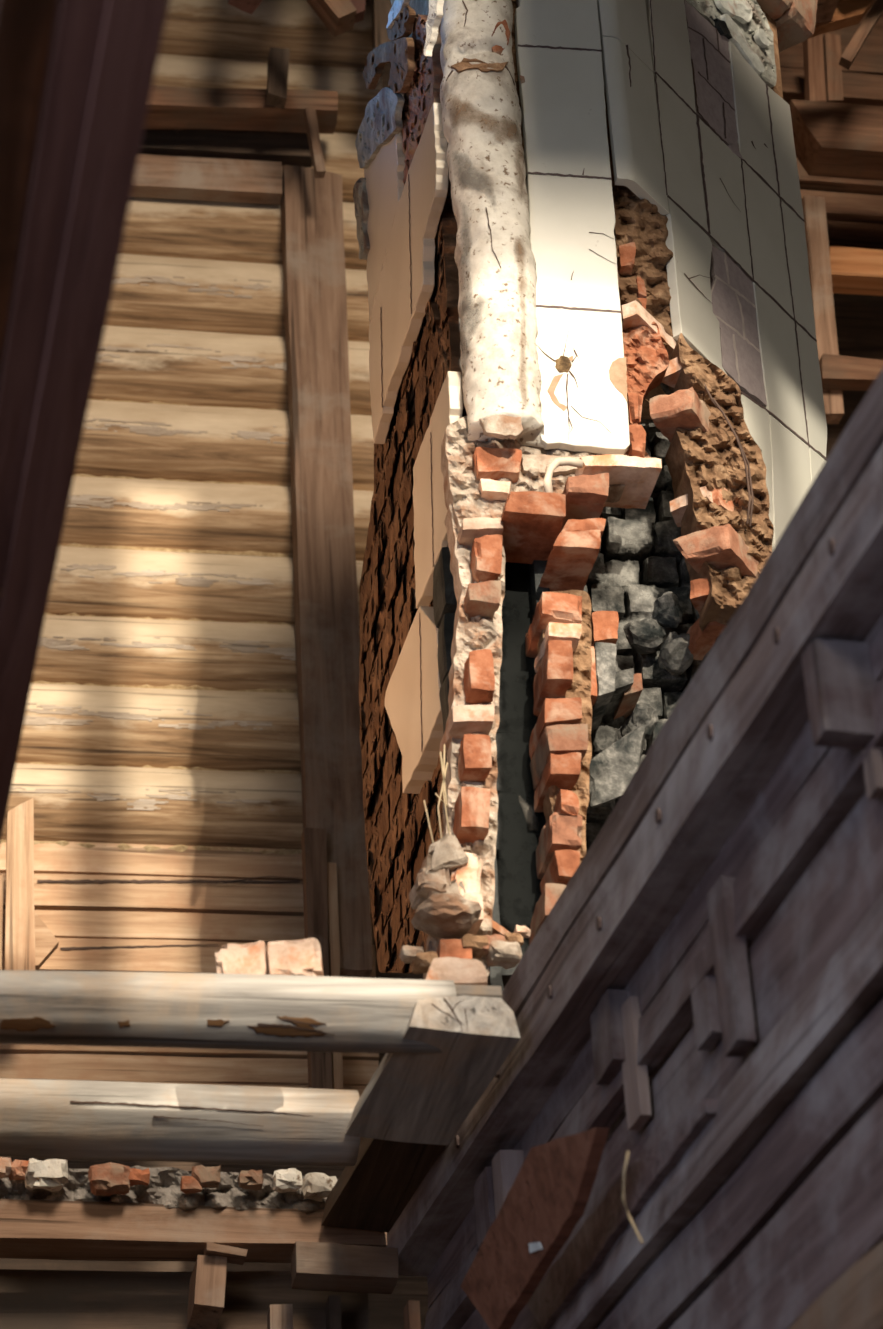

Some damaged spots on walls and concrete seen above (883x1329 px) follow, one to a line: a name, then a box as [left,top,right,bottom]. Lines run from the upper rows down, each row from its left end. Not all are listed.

peeling [353,0,515,260]
spalling [479,414,523,440]
crack [536,330,609,442]
spalling [711,245,767,407]